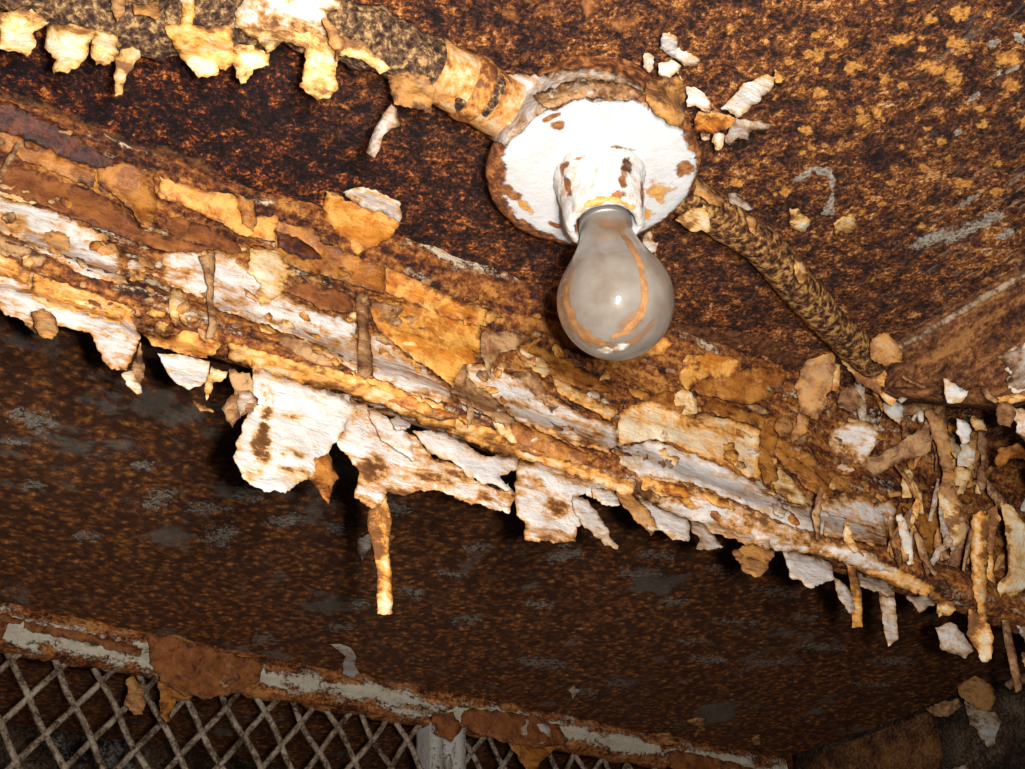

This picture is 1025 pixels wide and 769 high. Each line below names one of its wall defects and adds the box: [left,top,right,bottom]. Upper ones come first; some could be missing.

rust [924,2,971,25]
peeling [0,9,142,97]
peeling [111,0,436,114]
rust [542,112,564,130]
peeling [488,32,787,151]
rust [784,29,910,99]
rust [888,33,963,86]
rust [993,51,1023,92]
rust [500,185,533,213]
peeling [0,100,1025,662]
peeling [0,613,263,723]
peeling [330,644,360,678]